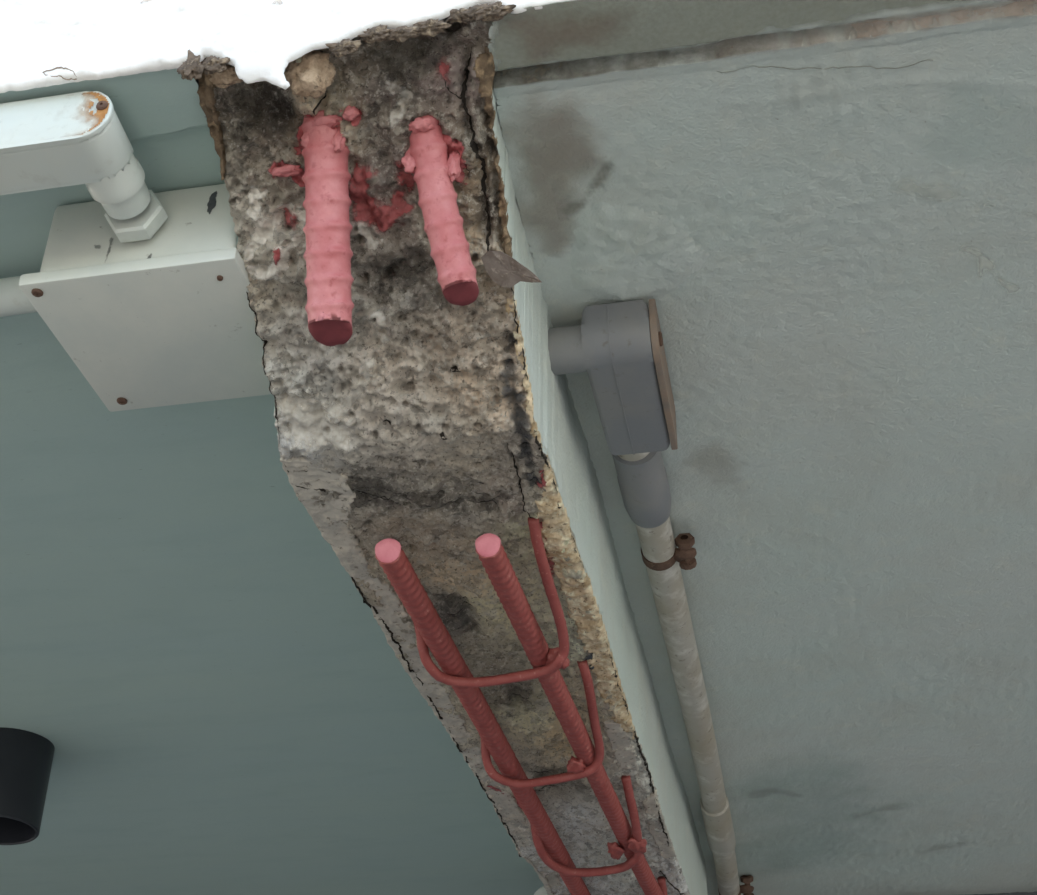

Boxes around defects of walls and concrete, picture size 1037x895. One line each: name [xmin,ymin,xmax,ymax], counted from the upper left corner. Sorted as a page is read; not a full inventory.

rust [80,92,109,135]
crack [443,47,491,252]
crack [718,60,933,73]
spalling [207,16,691,895]